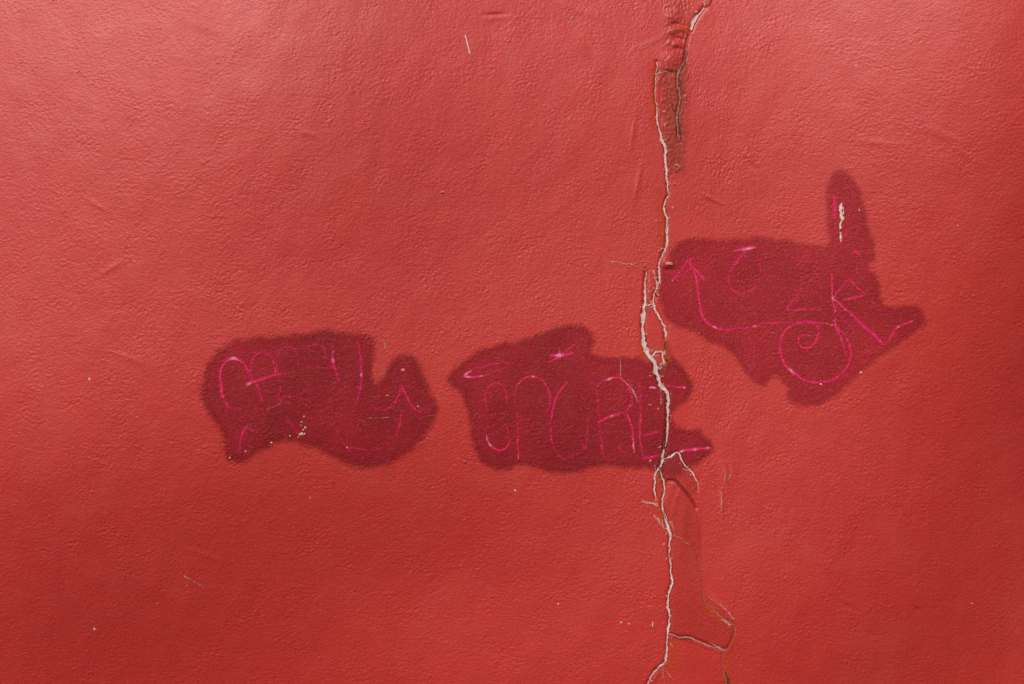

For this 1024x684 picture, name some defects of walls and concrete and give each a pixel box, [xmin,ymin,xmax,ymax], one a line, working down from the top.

crack [610,0,736,684]